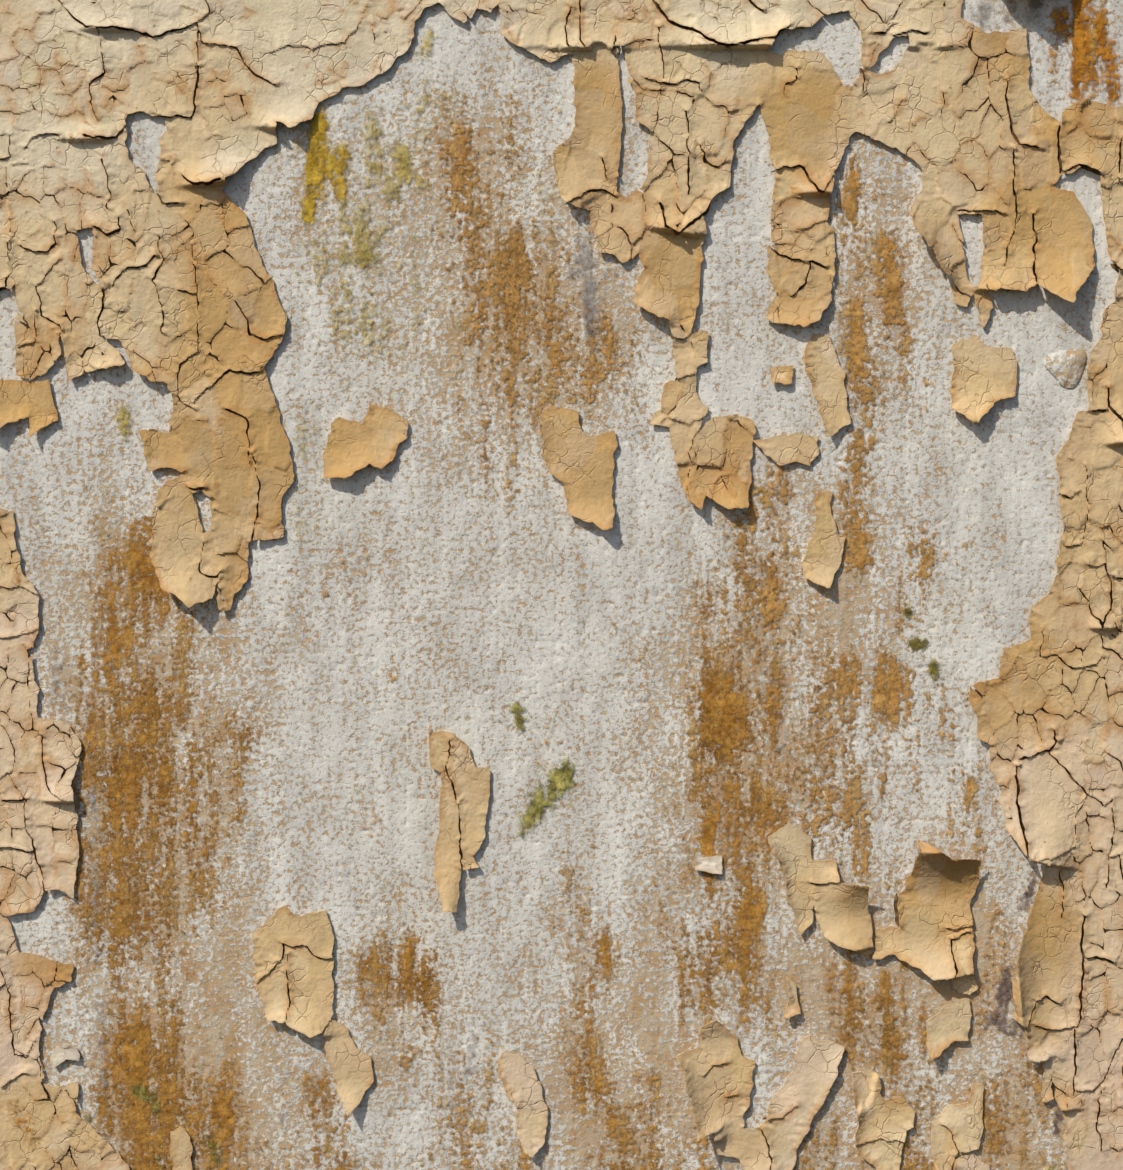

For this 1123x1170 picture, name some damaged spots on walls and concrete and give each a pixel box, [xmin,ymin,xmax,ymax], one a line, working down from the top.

crack [0,0,275,236]
crack [97,236,261,539]
rust [419,92,641,526]
peeling [0,0,1123,611]
rust [829,148,936,586]
peeling [0,508,135,1170]
rust [62,501,359,1170]
peeling [676,1020,845,1170]
rust [652,463,997,1040]
peeling [968,270,1123,1170]
crack [1015,731,1123,886]
crack [1031,872,1123,1149]